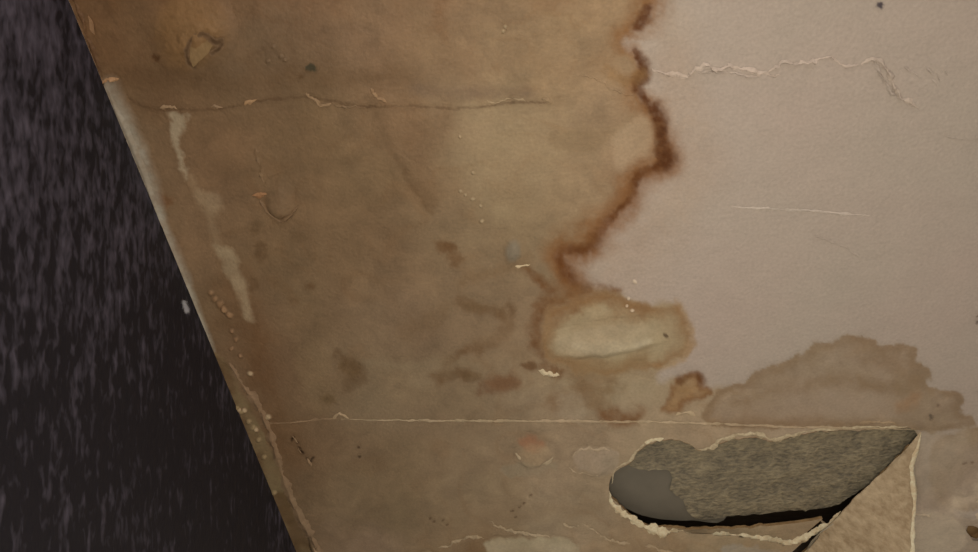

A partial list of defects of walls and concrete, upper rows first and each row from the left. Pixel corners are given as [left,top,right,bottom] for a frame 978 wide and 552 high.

crack [102,77,553,114]
crack [652,56,948,110]
leakage [69,0,759,552]
peeling [229,363,323,552]
leakage [699,330,978,552]
leakage [666,519,825,540]
hole [626,484,869,552]
flaking render [924,464,978,552]